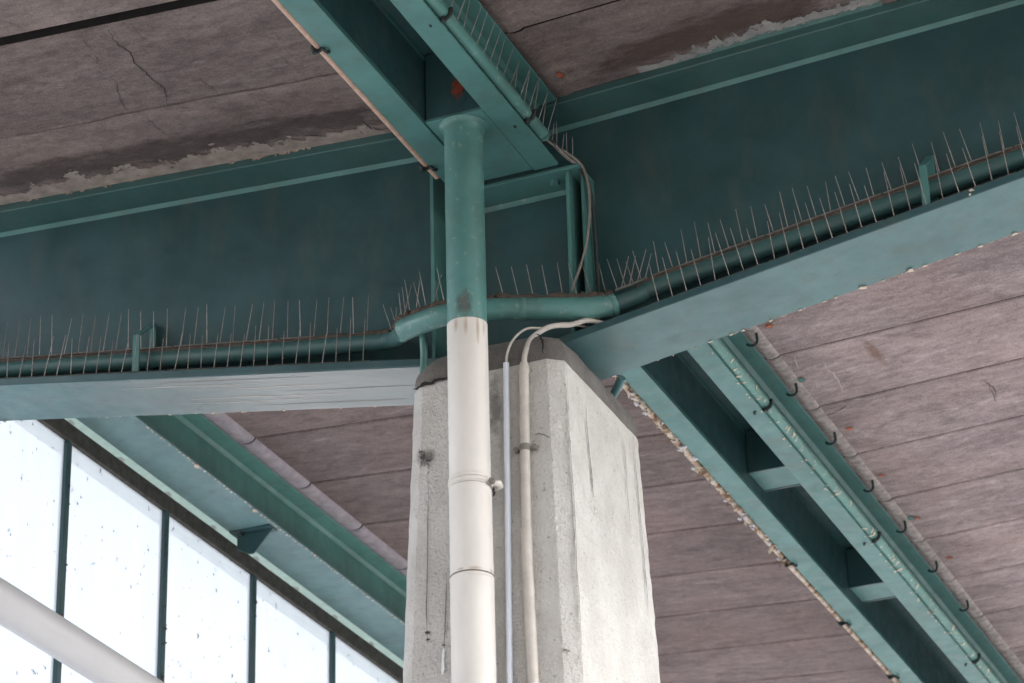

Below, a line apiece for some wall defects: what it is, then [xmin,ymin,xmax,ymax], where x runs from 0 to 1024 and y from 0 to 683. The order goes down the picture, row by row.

leakage [602,0,808,71]
peeling [636,0,883,73]
crack [0,29,338,139]
rust [451,79,465,98]
leakage [0,109,377,186]
peeling [0,123,392,205]